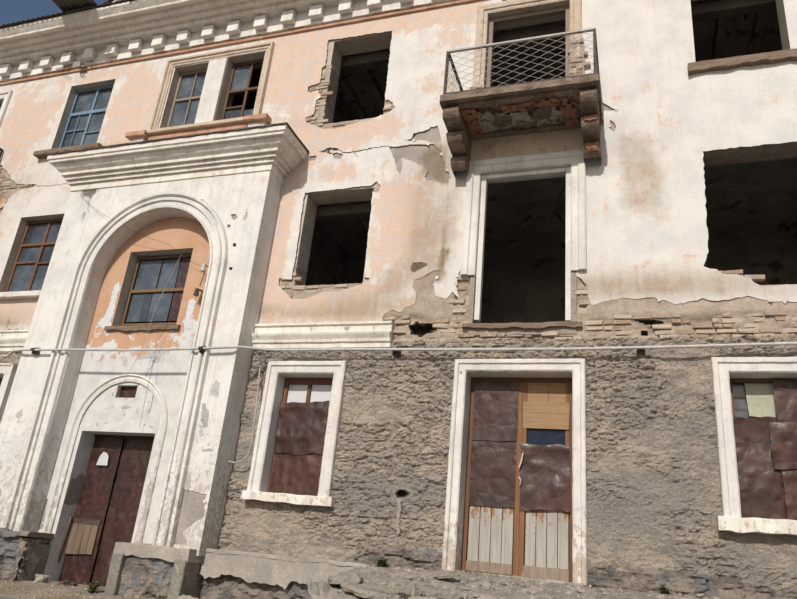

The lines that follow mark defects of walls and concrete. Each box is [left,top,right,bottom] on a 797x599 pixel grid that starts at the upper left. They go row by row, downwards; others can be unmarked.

flaking render [305,66,395,129]
peeling [460,96,619,136]
crack [319,146,382,156]
spalling [390,127,450,183]
spalling [0,165,34,214]
peeling [96,282,121,336]
peeling [183,298,196,331]
flaking render [279,264,369,300]
spalling [383,262,797,347]
spalling [174,473,208,545]